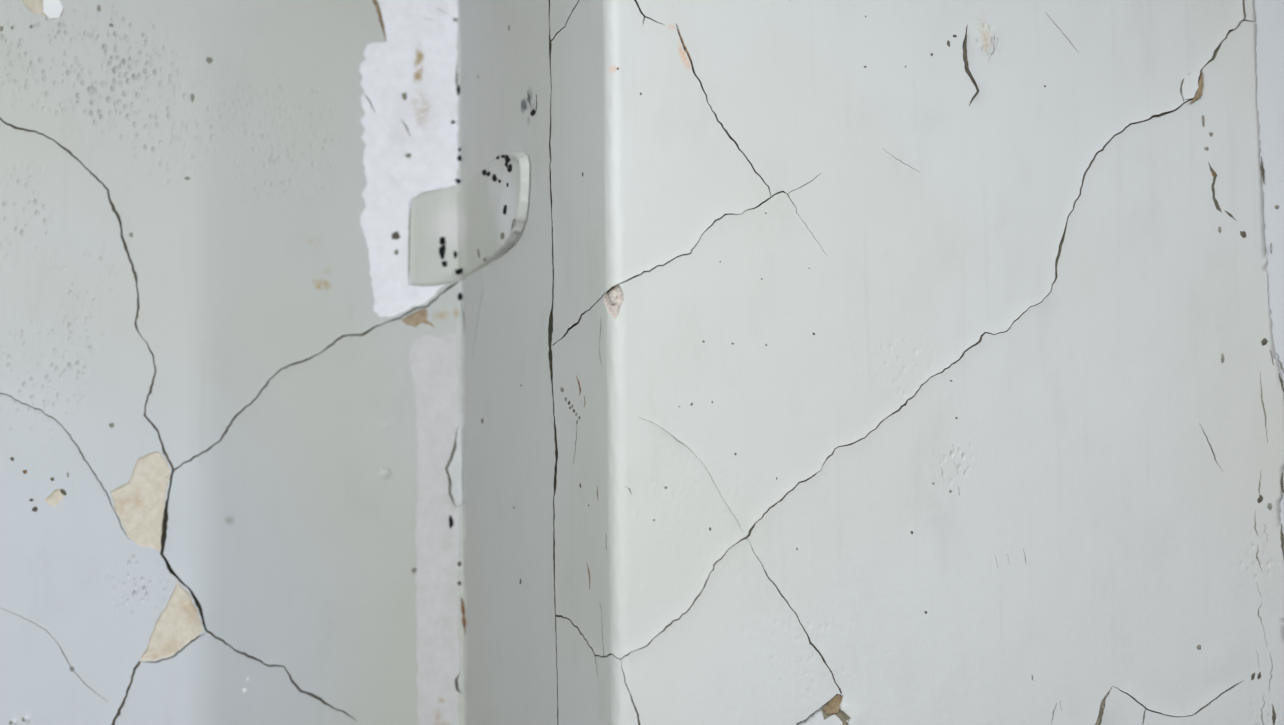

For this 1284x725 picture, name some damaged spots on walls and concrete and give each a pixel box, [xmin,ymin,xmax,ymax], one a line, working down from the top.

peeling [22,0,64,19]
water stain [519,85,539,128]
water stain [482,155,512,187]
flaking render [0,393,171,551]
crack [0,118,458,725]
peeling [359,0,466,725]
crack [553,0,1272,725]
crack [1260,338,1284,441]
flaking render [140,581,206,663]
crack [1254,472,1284,725]
peeling [796,694,851,725]